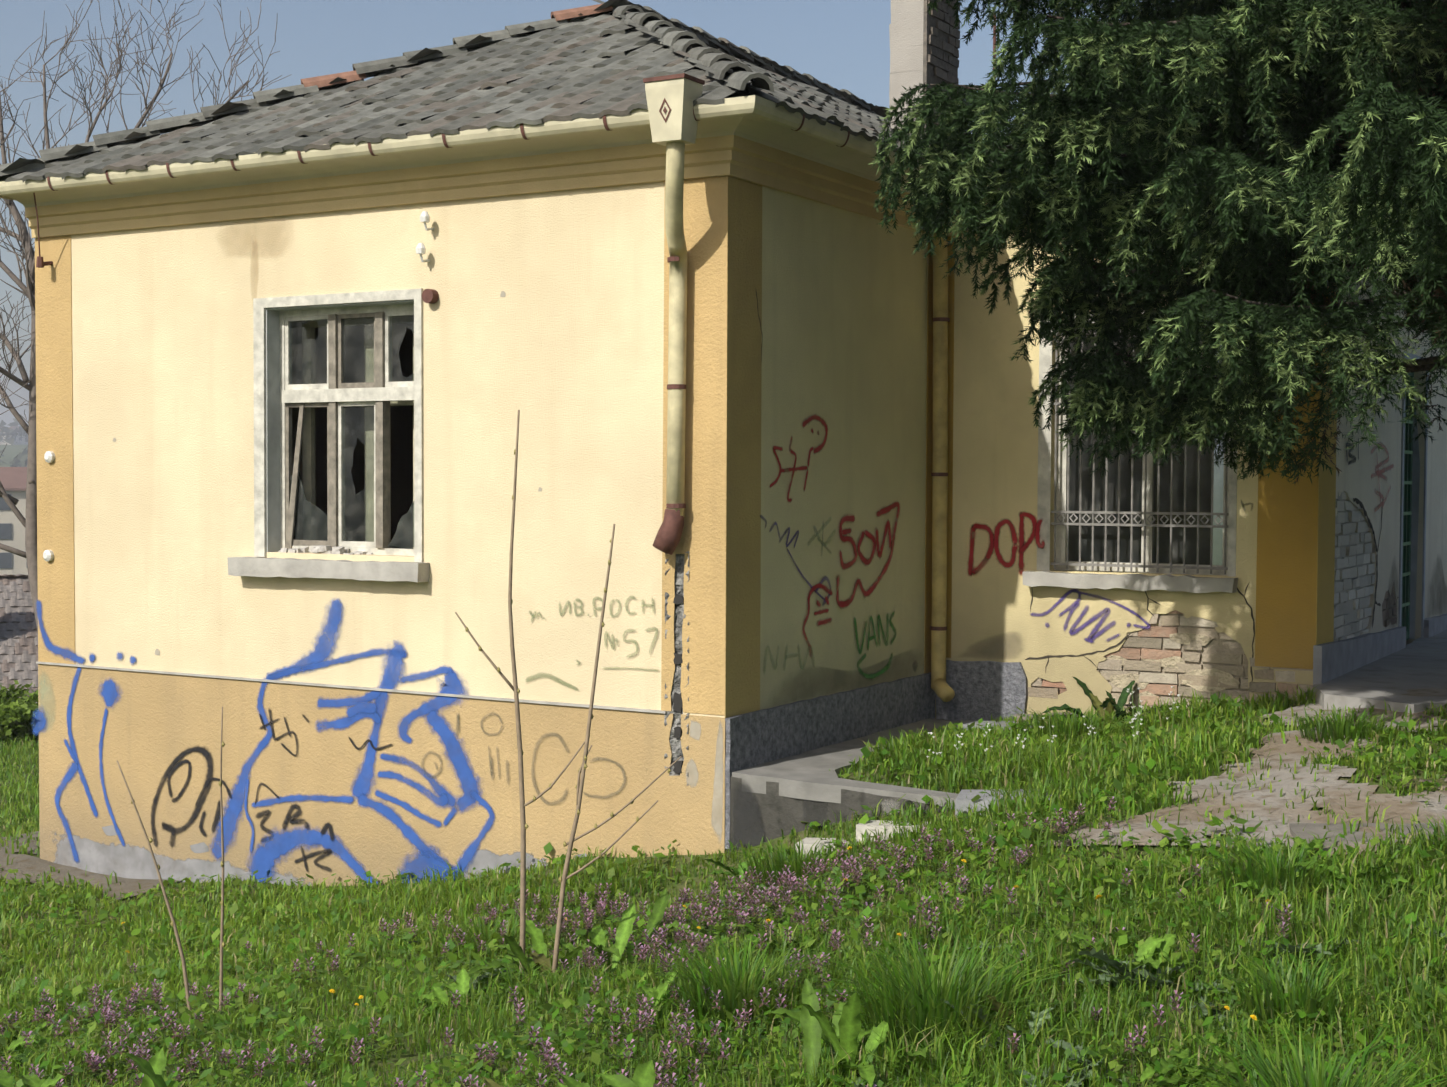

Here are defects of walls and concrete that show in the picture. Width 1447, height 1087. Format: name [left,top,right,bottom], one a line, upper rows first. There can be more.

flaking render [1334,491,1398,641]
flaking render [1094,610,1313,716]